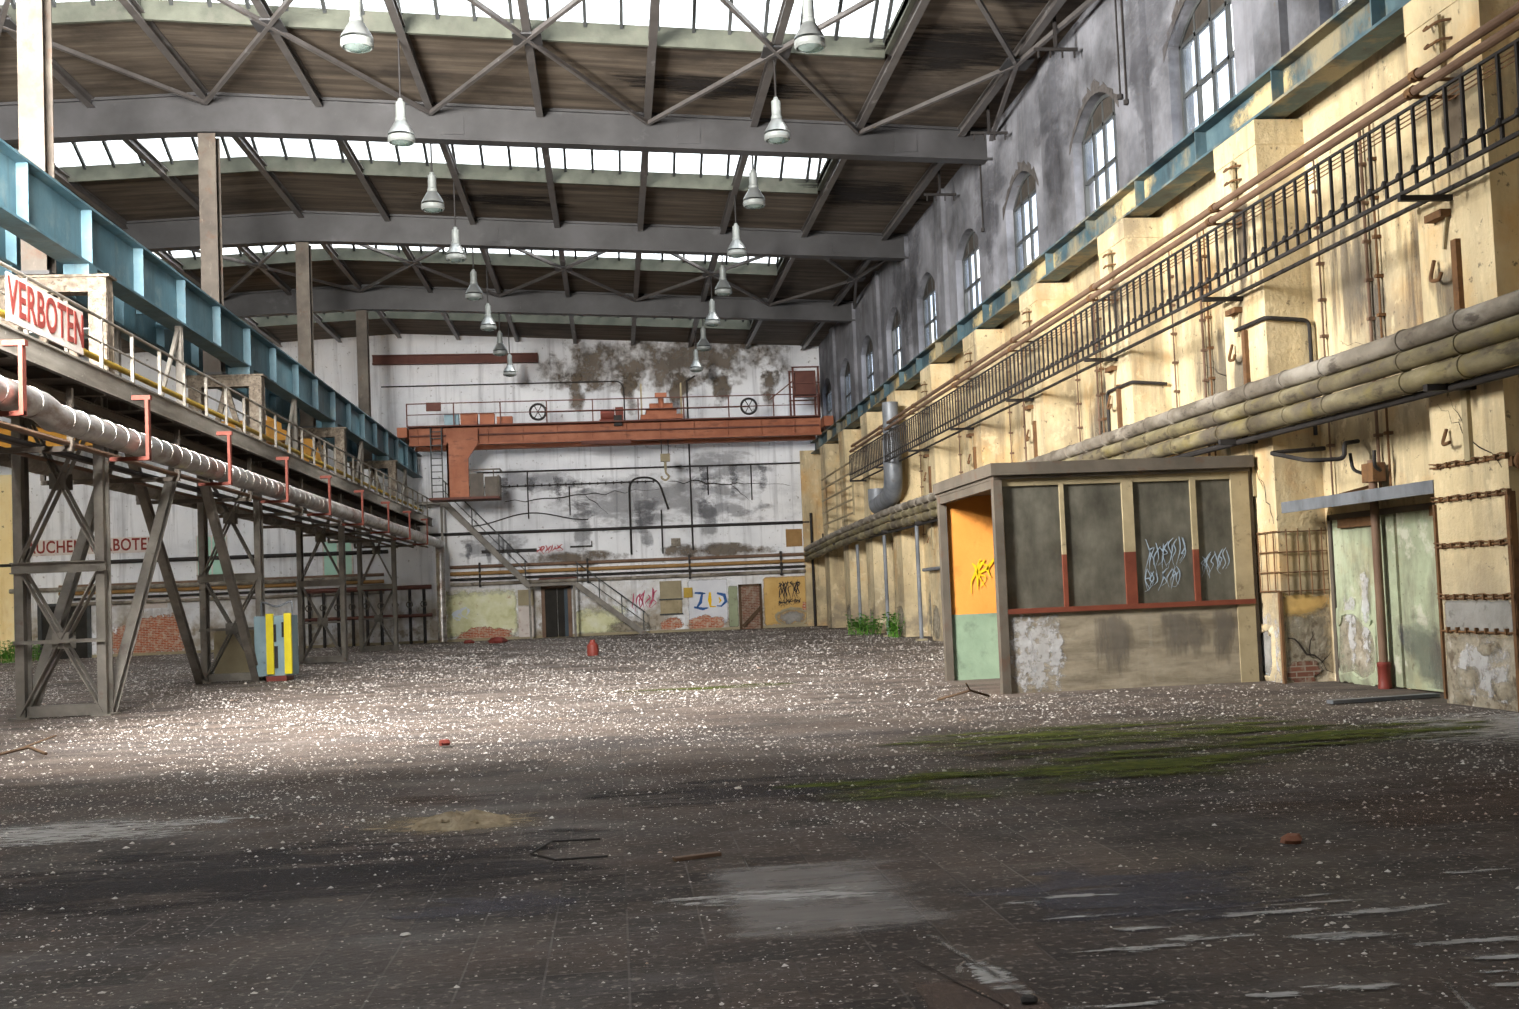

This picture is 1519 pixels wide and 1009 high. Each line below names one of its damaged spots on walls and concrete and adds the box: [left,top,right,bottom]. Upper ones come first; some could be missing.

water stain [544,341,788,410]
flaking render [1260,572,1378,686]
flaking render [1446,634,1518,712]